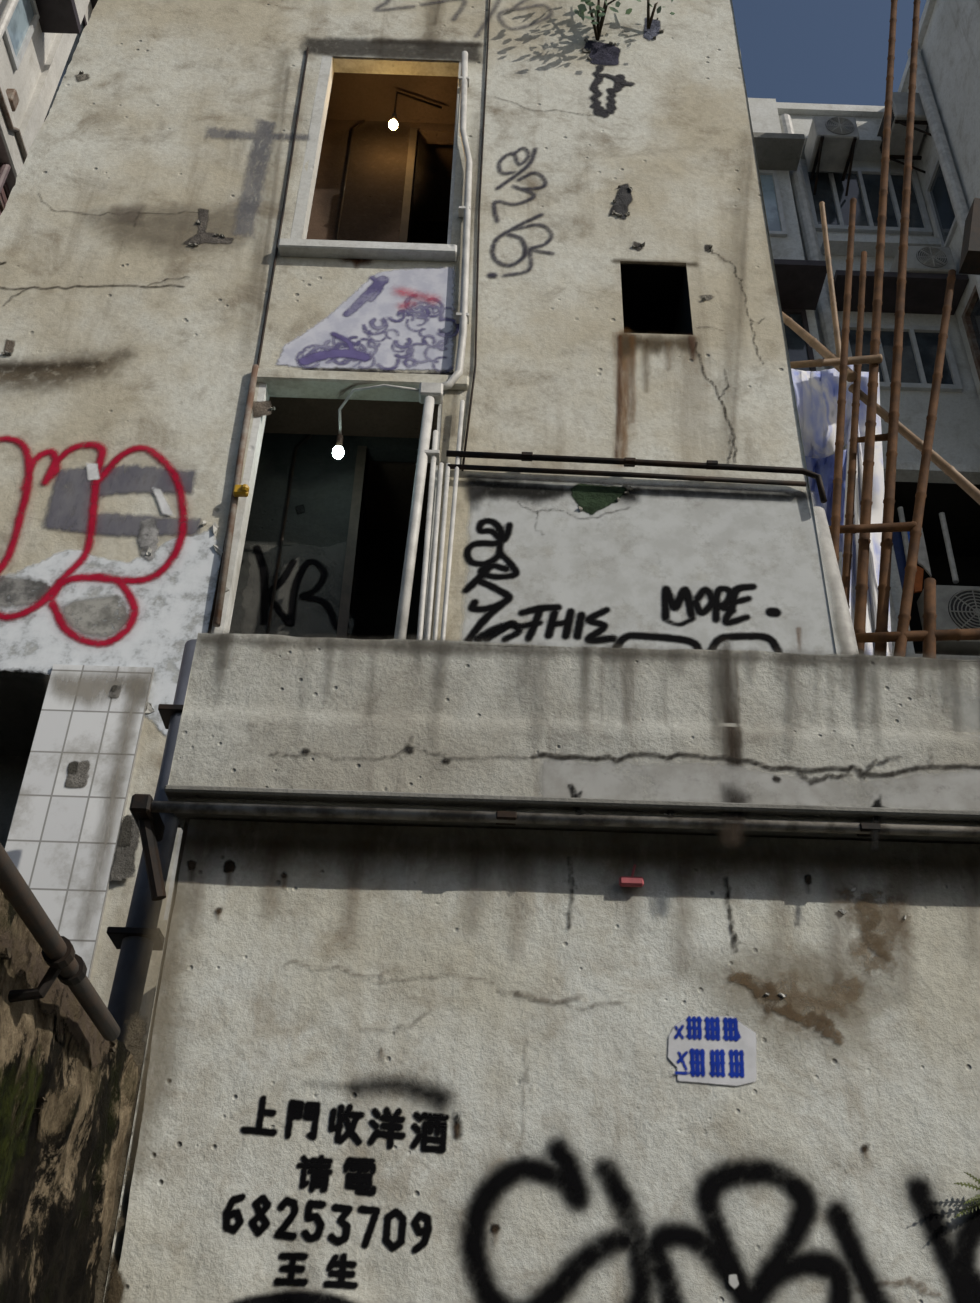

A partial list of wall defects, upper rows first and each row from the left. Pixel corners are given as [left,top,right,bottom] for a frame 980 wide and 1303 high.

crack [0,262,186,306]
damp [0,357,116,387]
rust [616,333,633,458]
crack [695,342,737,463]
peeling [0,518,354,735]
damp [384,640,491,652]
damp [602,648,684,658]
damp [783,654,817,663]
damp [723,641,742,768]
crack [533,752,980,825]